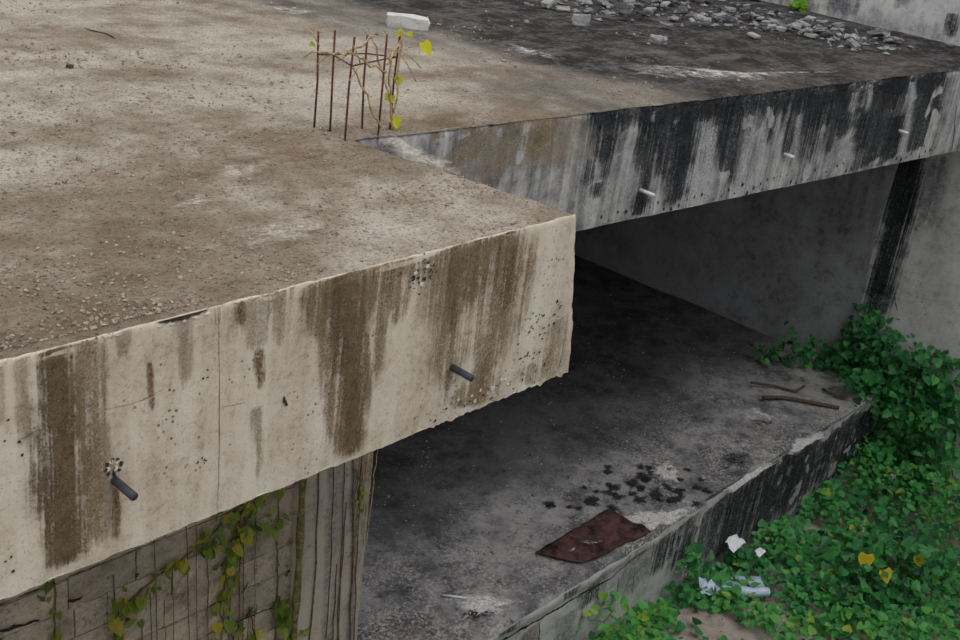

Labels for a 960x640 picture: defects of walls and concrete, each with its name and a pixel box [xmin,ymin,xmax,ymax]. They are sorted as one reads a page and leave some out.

damp [944,13,958,36]
damp [674,68,767,78]
damp [440,71,957,315]
damp [116,330,131,355]
damp [234,231,536,455]
damp [15,338,114,566]
damp [251,408,262,475]